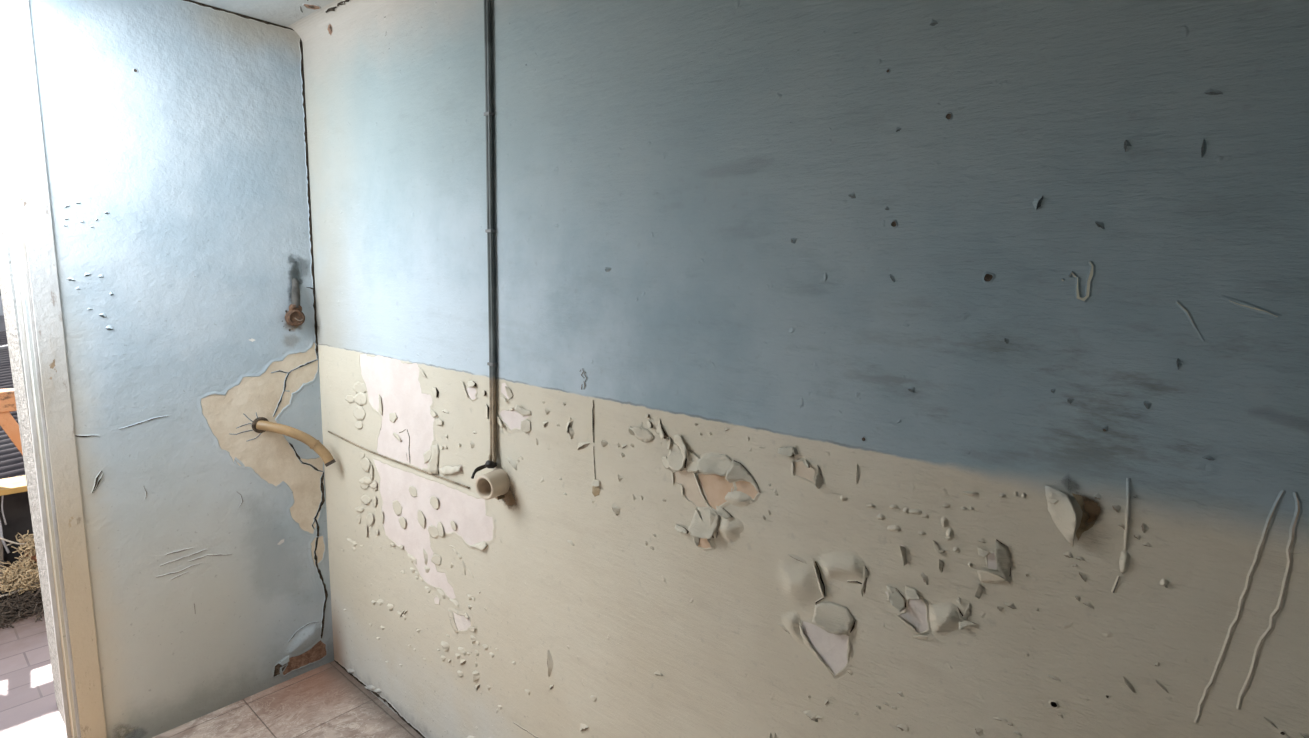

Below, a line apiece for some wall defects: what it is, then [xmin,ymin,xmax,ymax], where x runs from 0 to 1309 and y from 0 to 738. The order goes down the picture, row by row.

peeling [748,437,822,489]
peeling [197,339,778,691]
peeling [885,540,946,639]
peeling [956,538,1029,631]
peeling [1045,485,1151,609]
peeling [799,602,857,679]